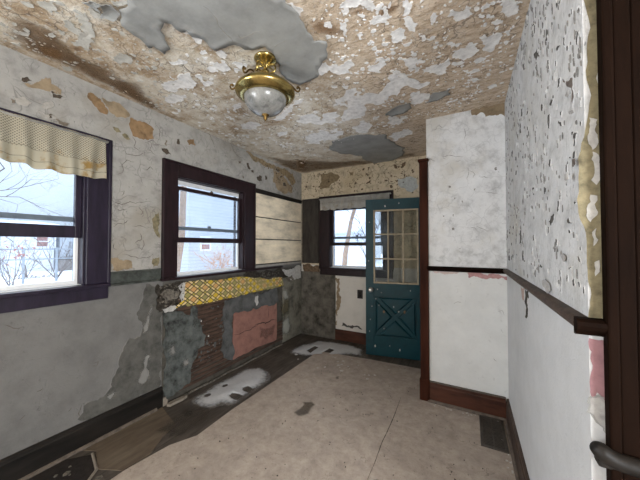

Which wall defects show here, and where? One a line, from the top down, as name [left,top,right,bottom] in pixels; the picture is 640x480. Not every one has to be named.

water stain [22,25,146,101]
peeling [0,0,603,320]
flaking render [76,281,283,422]
peeling [587,338,605,432]